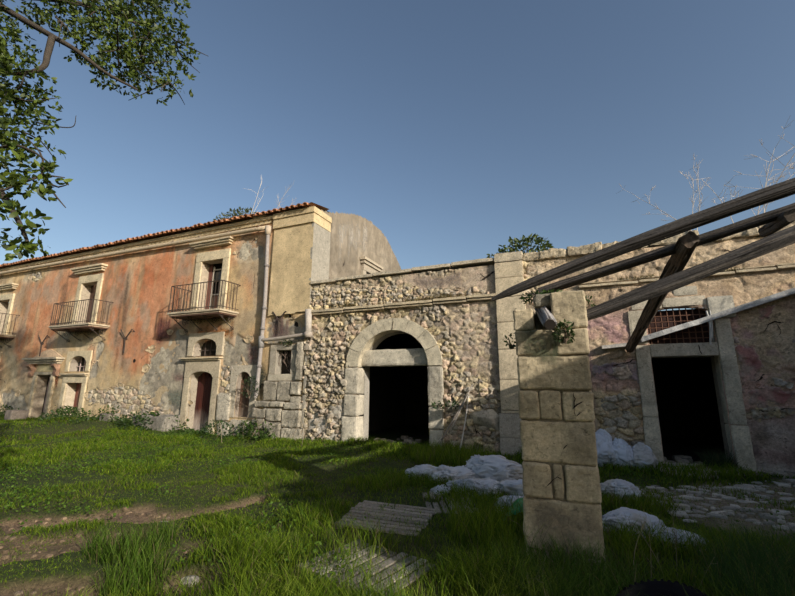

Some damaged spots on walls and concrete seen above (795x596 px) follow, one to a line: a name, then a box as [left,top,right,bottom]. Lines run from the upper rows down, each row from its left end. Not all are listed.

spalling [84,329,193,421]
spalling [592,361,645,448]